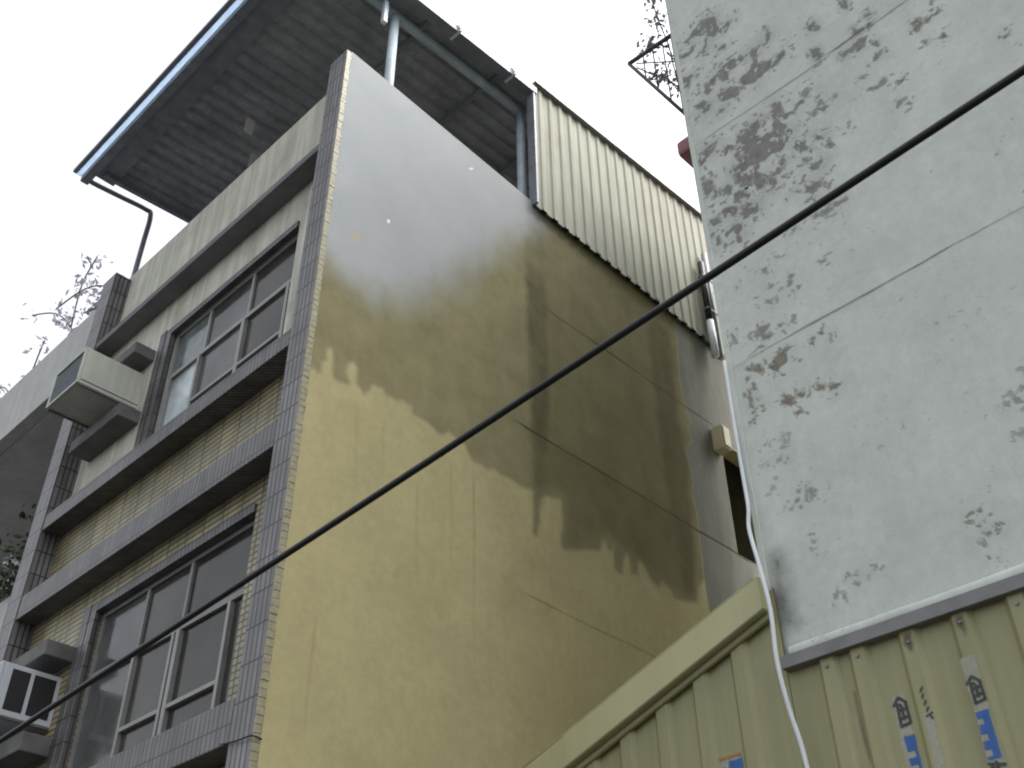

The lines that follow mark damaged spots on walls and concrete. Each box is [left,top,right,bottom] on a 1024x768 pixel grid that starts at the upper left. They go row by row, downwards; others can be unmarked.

peeling [906,0,952,51]
peeling [673,0,923,613]
water stain [310,52,706,667]
peeling [994,365,1024,445]
peeling [953,500,1015,574]